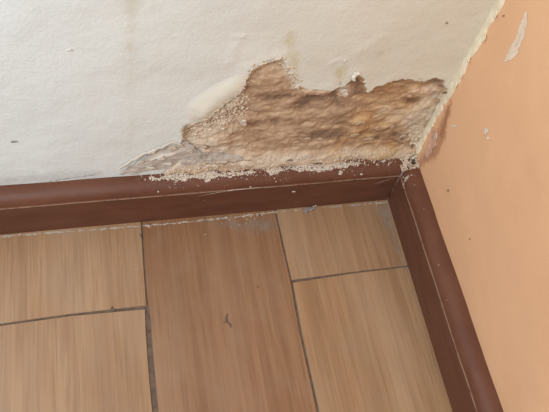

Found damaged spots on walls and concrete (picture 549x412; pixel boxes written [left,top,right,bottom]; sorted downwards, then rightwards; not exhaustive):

spalling [118,57,447,182]
water stain [421,108,449,163]
water stain [149,169,255,181]
water stain [265,160,364,175]